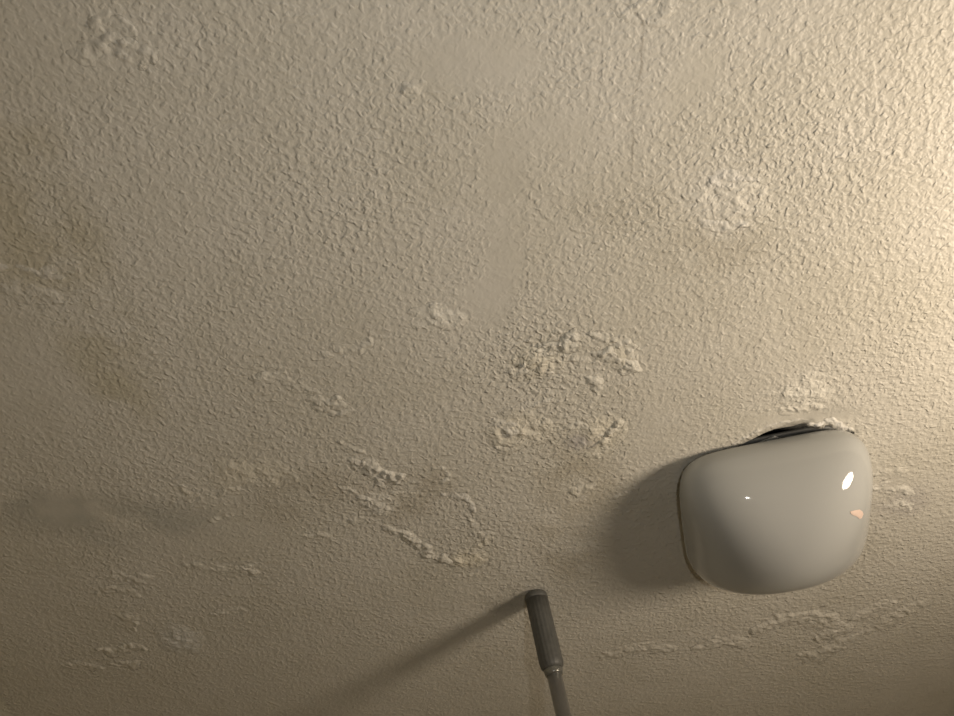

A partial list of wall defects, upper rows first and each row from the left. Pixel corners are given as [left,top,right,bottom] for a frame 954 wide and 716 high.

spalling [731,402,854,445]